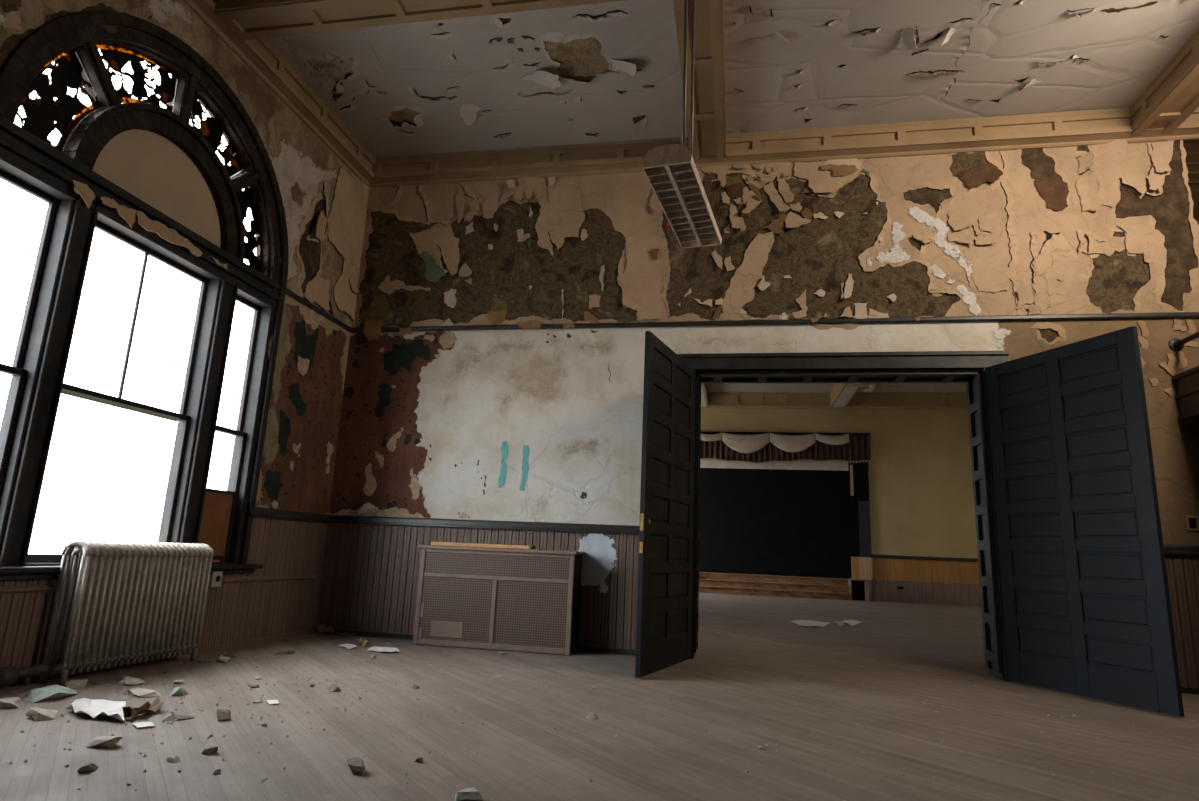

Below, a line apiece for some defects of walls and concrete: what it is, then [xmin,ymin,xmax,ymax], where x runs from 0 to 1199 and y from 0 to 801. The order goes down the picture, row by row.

water stain [0,0,21,13]
water stain [0,2,141,70]
peeling [522,32,637,90]
flaking render [260,138,1199,527]